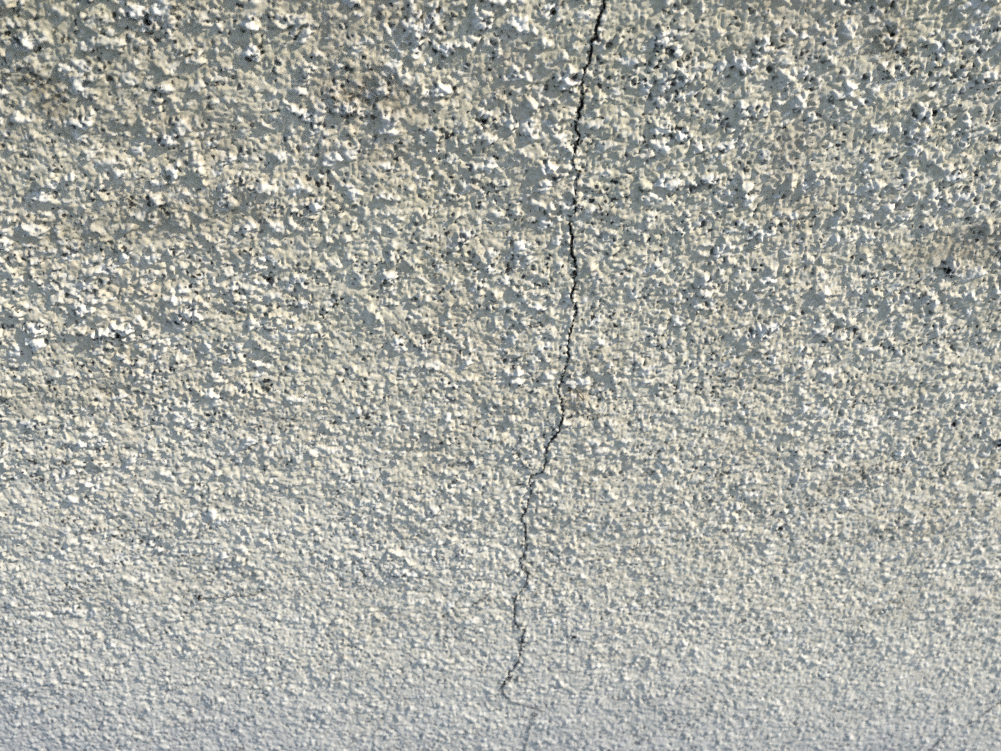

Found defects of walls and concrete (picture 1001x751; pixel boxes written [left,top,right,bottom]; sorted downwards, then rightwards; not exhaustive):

crack [499,0,606,750]